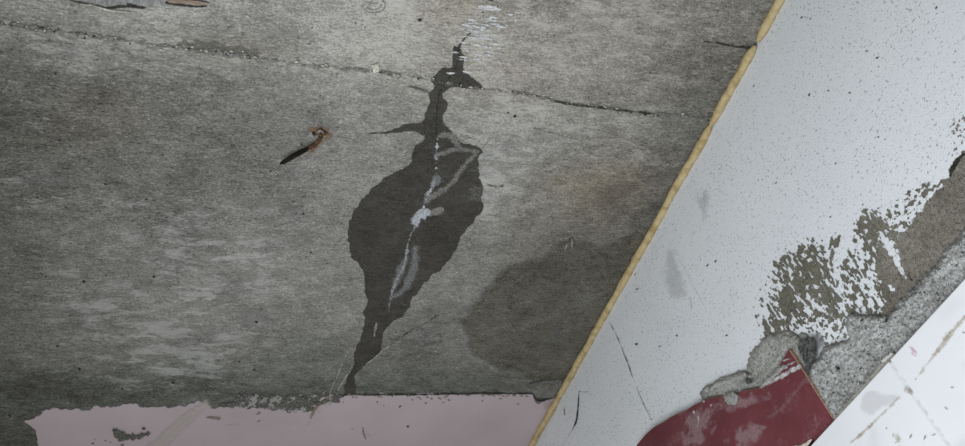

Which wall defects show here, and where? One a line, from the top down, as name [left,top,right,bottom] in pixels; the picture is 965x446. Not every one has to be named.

crack [703,41,750,49]
leakage [344,32,484,396]
leakage [464,229,648,384]
peeling [755,115,965,345]
spalling [637,350,835,446]